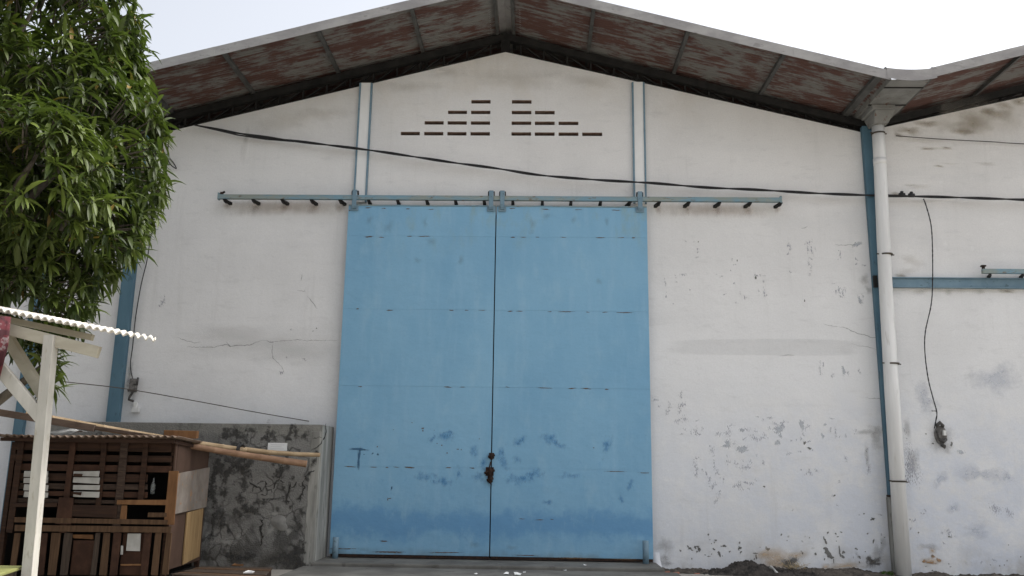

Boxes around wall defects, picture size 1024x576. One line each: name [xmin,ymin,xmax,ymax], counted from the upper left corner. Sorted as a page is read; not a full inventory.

crack [249,424,327,546]
peeling [695,416,836,501]
peeling [680,534,770,560]
peeling [784,532,885,568]